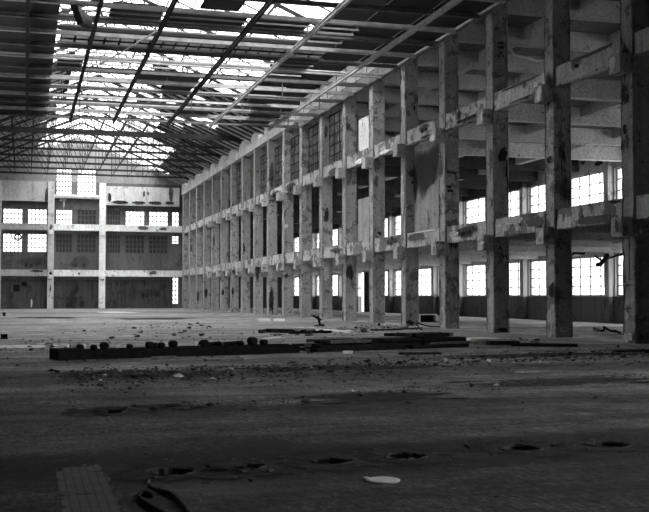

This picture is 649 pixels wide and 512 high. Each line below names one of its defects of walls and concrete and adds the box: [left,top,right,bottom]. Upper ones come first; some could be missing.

spalling [489,147,509,176]
peeling [496,216,544,234]